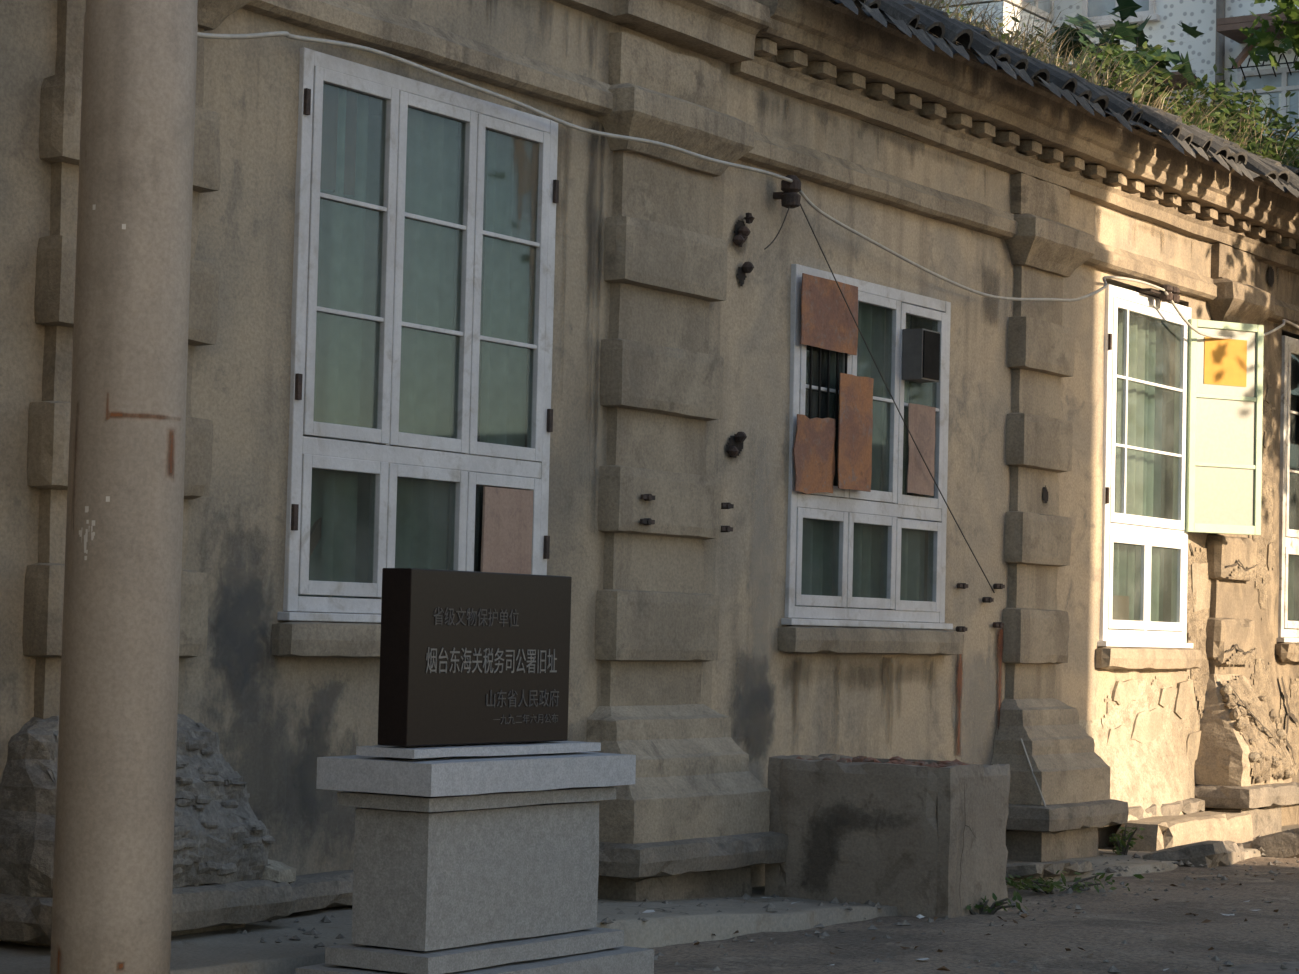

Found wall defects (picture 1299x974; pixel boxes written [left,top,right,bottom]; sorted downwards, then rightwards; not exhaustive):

rust [106,396,174,476]
spalling [1228,359,1276,620]
spalling [1102,543,1299,784]